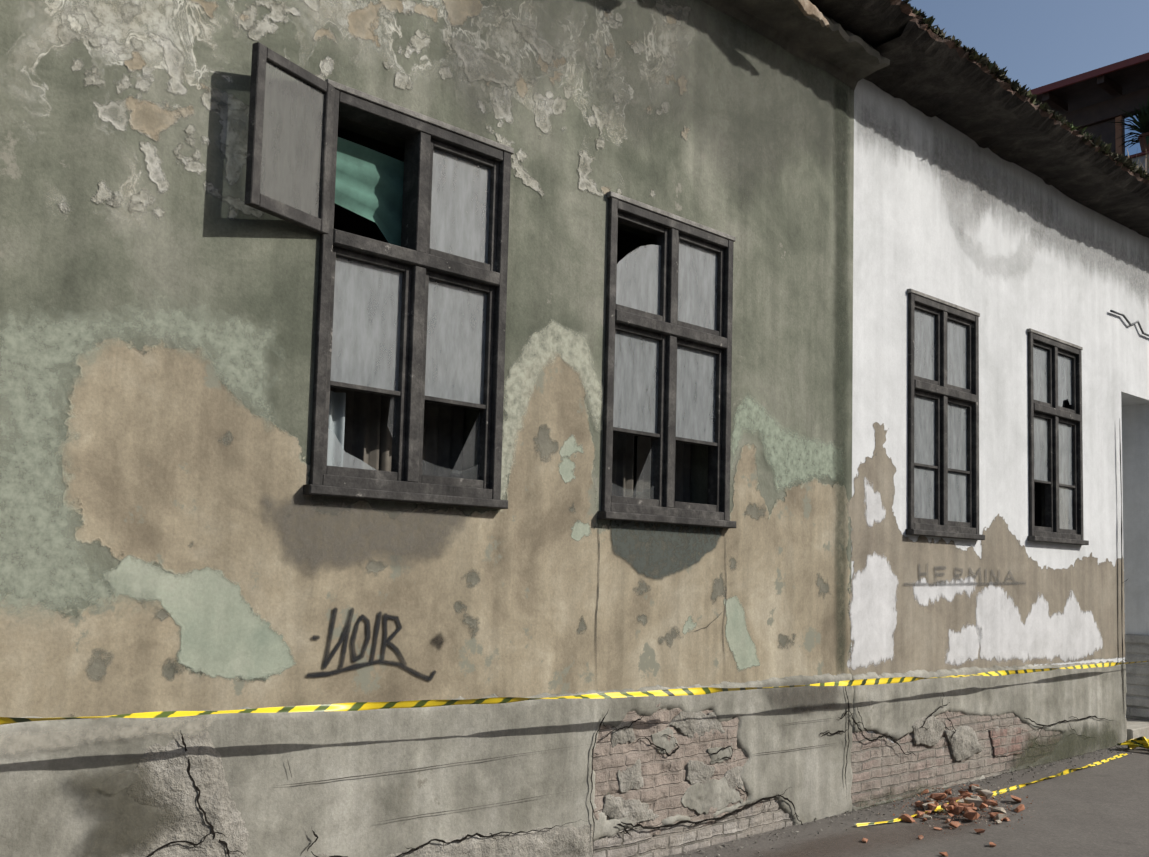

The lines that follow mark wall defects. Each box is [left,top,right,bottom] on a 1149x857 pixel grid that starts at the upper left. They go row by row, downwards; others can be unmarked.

peeling [58,0,265,219]
peeling [191,0,320,41]
peeling [316,57,334,81]
peeling [346,0,574,197]
peeling [577,93,623,197]
peeling [0,336,1125,720]
crack [146,730,244,857]
flaking render [386,702,793,857]
crack [276,686,956,857]
flaking render [851,711,1063,807]